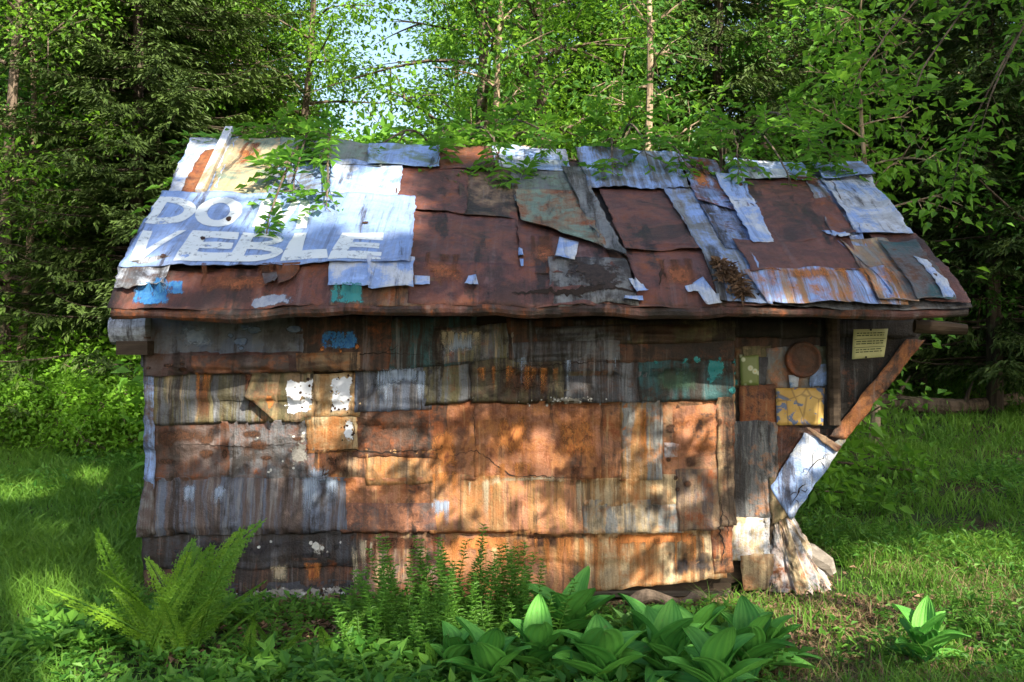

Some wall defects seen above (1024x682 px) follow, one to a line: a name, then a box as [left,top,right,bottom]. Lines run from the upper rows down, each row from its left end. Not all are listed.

peeling [133,278,183,304]
corrosion [793,267,871,283]
peeling [320,331,359,353]
peeling [284,377,313,414]
peeling [330,374,355,441]
peeling [682,356,738,403]
corrosion [243,431,272,460]
corrosion [320,451,351,477]
crack [150,411,575,478]
corrosion [431,429,457,486]
corrosion [498,417,530,479]
corrosion [367,533,704,564]